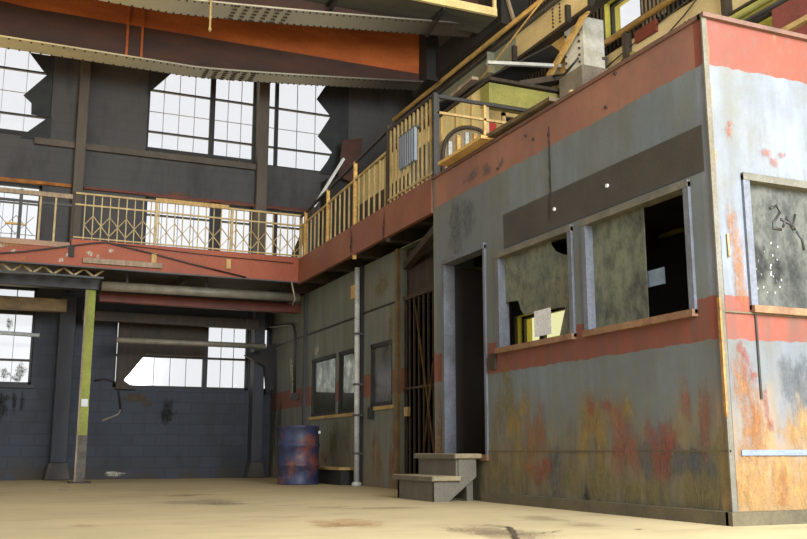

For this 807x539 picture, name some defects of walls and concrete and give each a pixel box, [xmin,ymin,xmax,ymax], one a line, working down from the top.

corrosion [734,367,763,450]